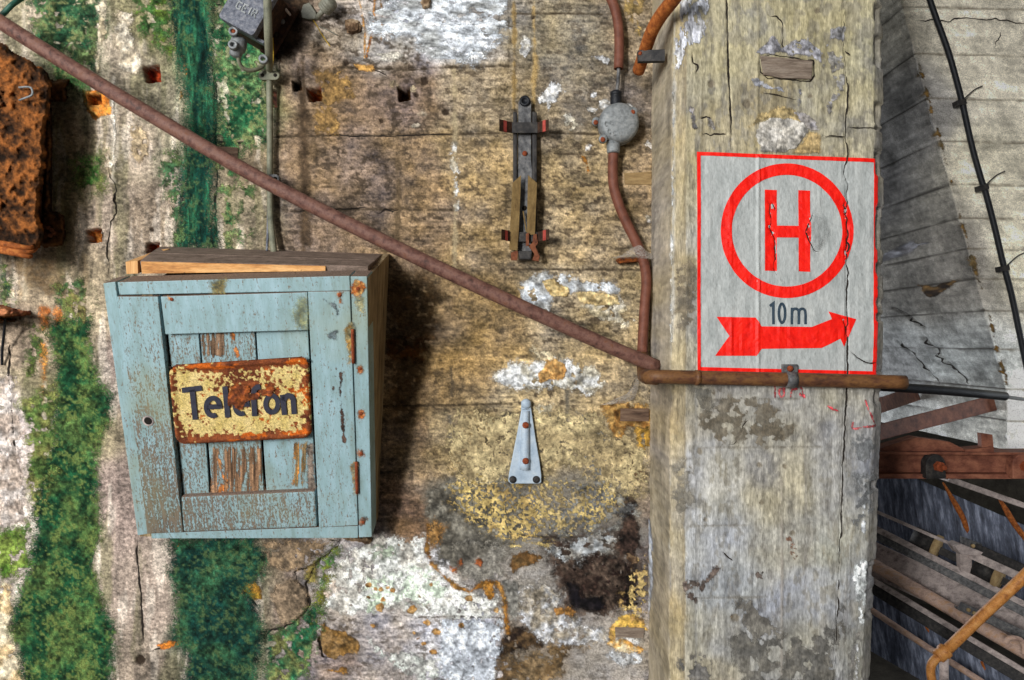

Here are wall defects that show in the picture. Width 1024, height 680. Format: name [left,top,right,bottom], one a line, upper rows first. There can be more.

efflorescence [366,0,511,66]
peeling [756,26,846,114]
peeling [688,106,715,130]
spalling [749,89,821,154]
crack [99,169,117,273]
efflorescence [520,271,634,329]
crack [823,1,968,666]
efflorescence [493,348,606,415]
rust [365,582,395,612]
damp [318,476,653,680]
rust [509,550,542,573]
rust [413,619,441,654]